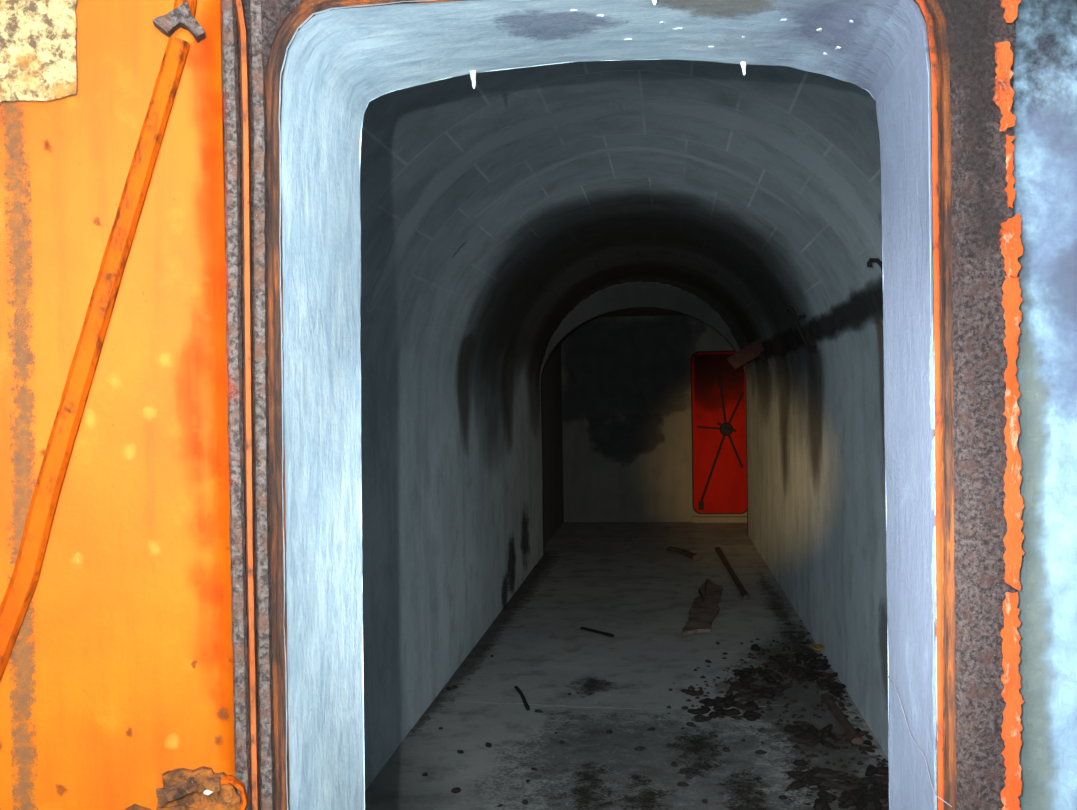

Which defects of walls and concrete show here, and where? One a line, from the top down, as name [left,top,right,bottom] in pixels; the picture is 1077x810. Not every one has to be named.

peeling [1000,0,1022,23]
corrosion [0,101,45,564]
damp [562,315,704,462]
damp [774,338,789,474]
damp [806,334,821,473]
peeling [992,41,1025,810]
damp [502,513,530,609]
corrosion [0,601,38,810]
damp [571,678,618,697]
damp [551,763,668,810]
damp [668,732,722,779]
damp [720,770,770,810]